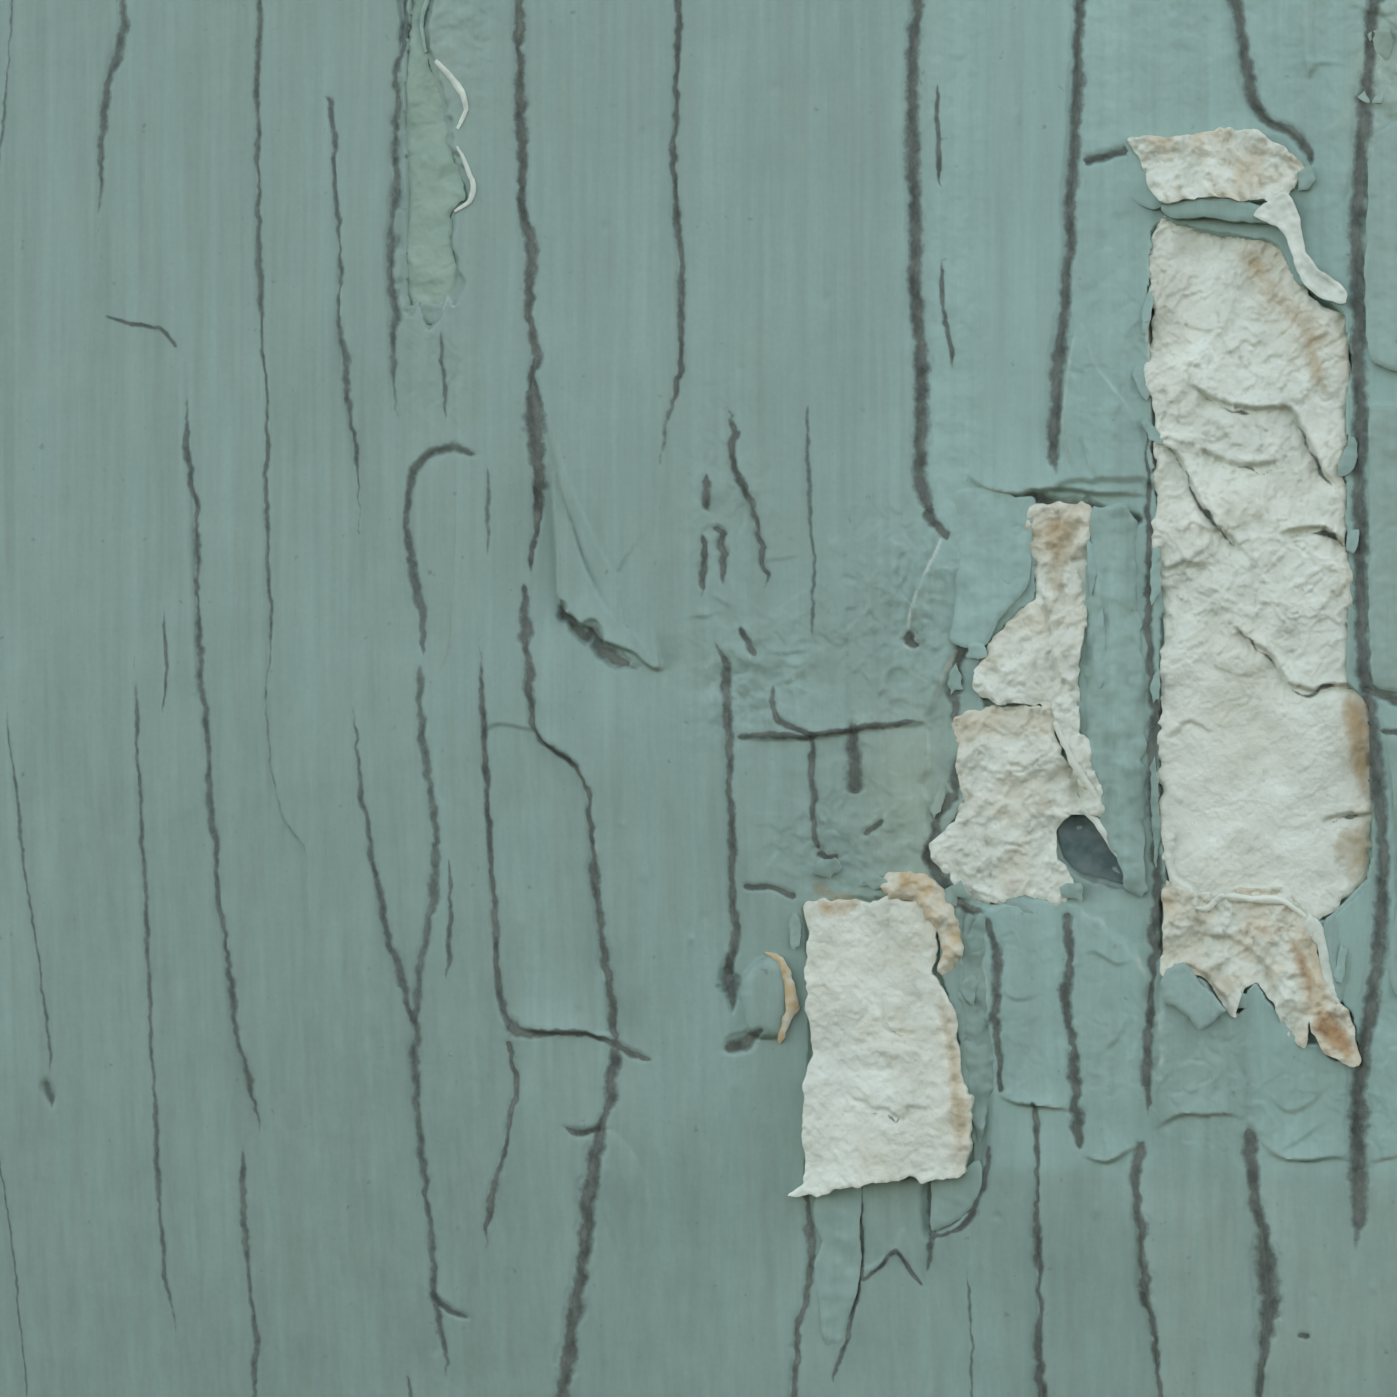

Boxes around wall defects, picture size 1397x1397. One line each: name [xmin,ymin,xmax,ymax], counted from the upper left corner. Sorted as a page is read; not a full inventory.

crack [135,417,259,1299]
crack [354,444,490,1365]
peeling [405,0,476,325]
crack [479,0,650,1397]
crack [719,628,914,1052]
crack [906,0,954,539]
crack [922,762,1084,1397]
peeling [788,120,1397,1347]
crack [1030,0,1163,1106]
crack [1230,0,1313,161]
crack [1243,1129,1310,1397]
crack [1350,0,1397,1229]